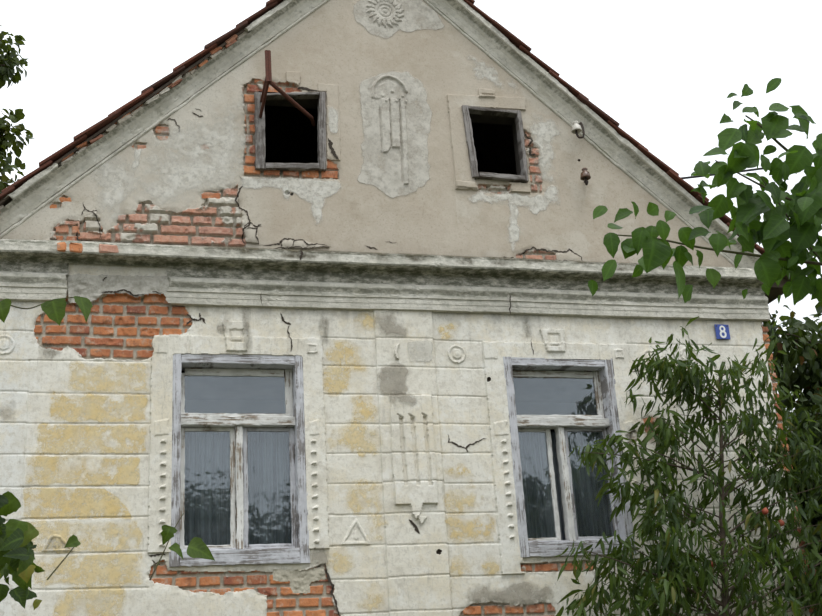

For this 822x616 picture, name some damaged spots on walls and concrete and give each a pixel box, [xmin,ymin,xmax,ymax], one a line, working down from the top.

flaking render [153,124,169,140]
flaking render [242,78,339,179]
flaking render [523,129,543,194]
flaking render [50,184,247,248]
flaking render [516,249,557,260]
crack [281,314,293,351]
flaking render [24,273,192,616]
crack [448,435,487,452]
flaking render [149,553,351,616]